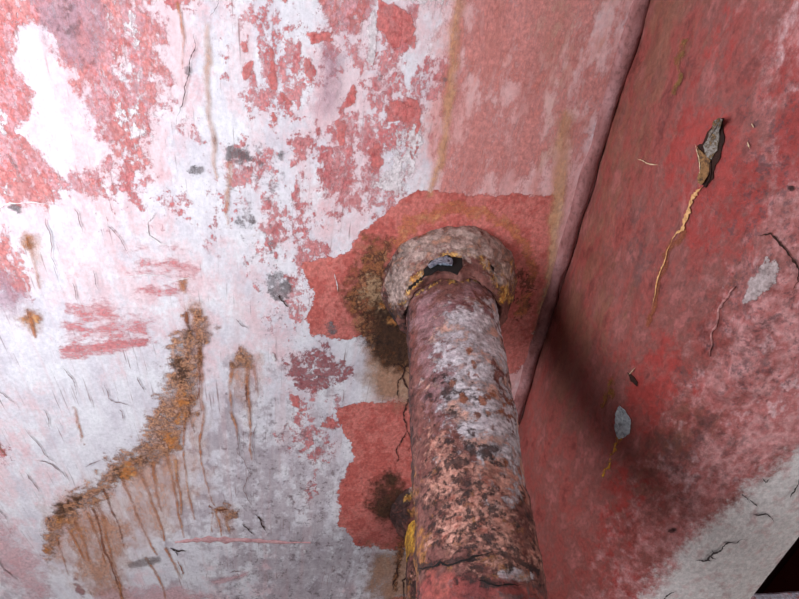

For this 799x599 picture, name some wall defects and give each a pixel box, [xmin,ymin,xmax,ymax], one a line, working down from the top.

peeling [0,0,178,212]
peeling [695,118,725,190]
peeling [0,231,34,300]
peeling [59,305,148,358]
rust [338,234,409,373]
peeling [202,0,626,551]
peeling [742,256,779,304]
crack [758,233,799,293]
rust [41,307,239,599]
rust [229,346,256,428]
crack [393,363,411,461]
peeling [614,406,631,439]